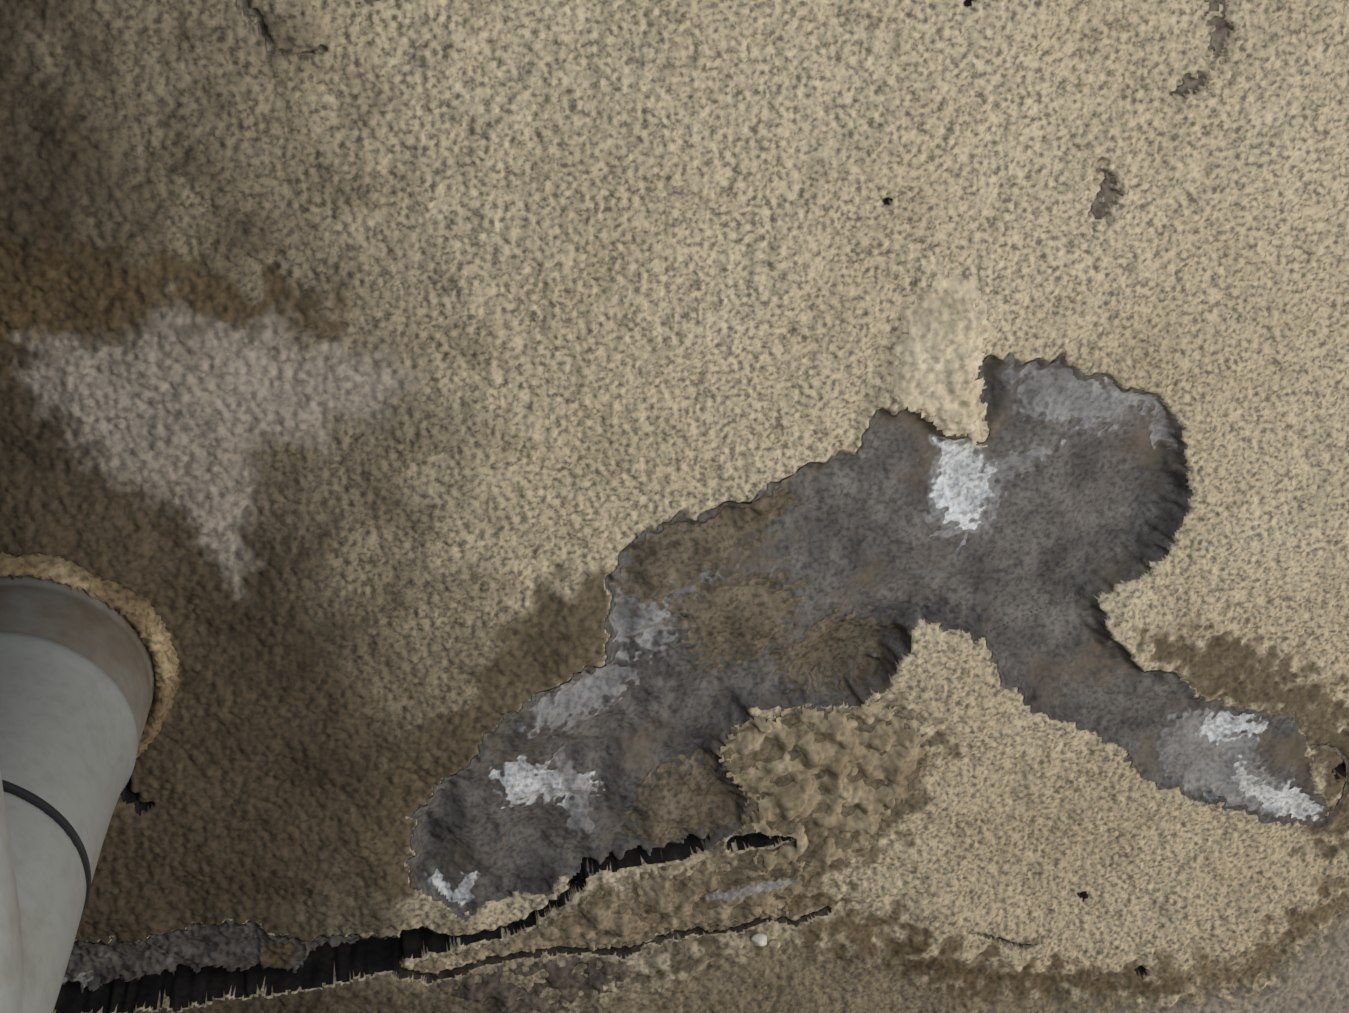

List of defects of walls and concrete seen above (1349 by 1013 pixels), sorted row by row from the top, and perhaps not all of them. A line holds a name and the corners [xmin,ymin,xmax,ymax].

crack [54,832,832,1013]
water stain [554,726,957,963]
water stain [780,700,909,743]
spalling [406,353,1349,1013]
water stain [1138,615,1349,859]